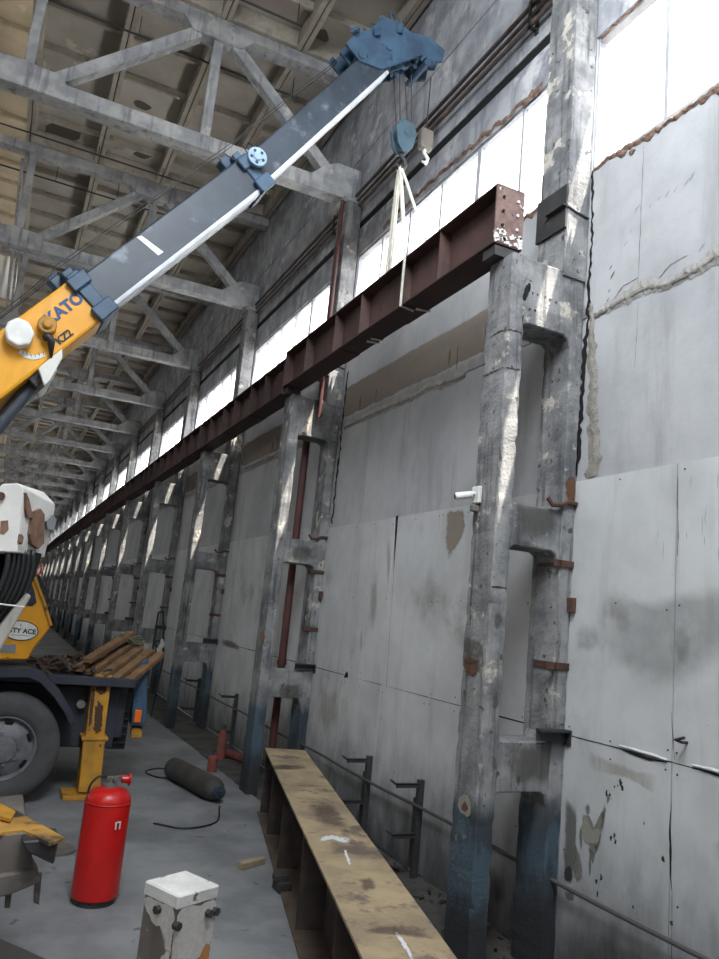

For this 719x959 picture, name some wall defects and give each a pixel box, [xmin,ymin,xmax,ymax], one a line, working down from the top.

spalling [593,83,719,171]
crack [576,170,603,479]
corrosion [566,477,575,501]
peeling [580,779,624,897]